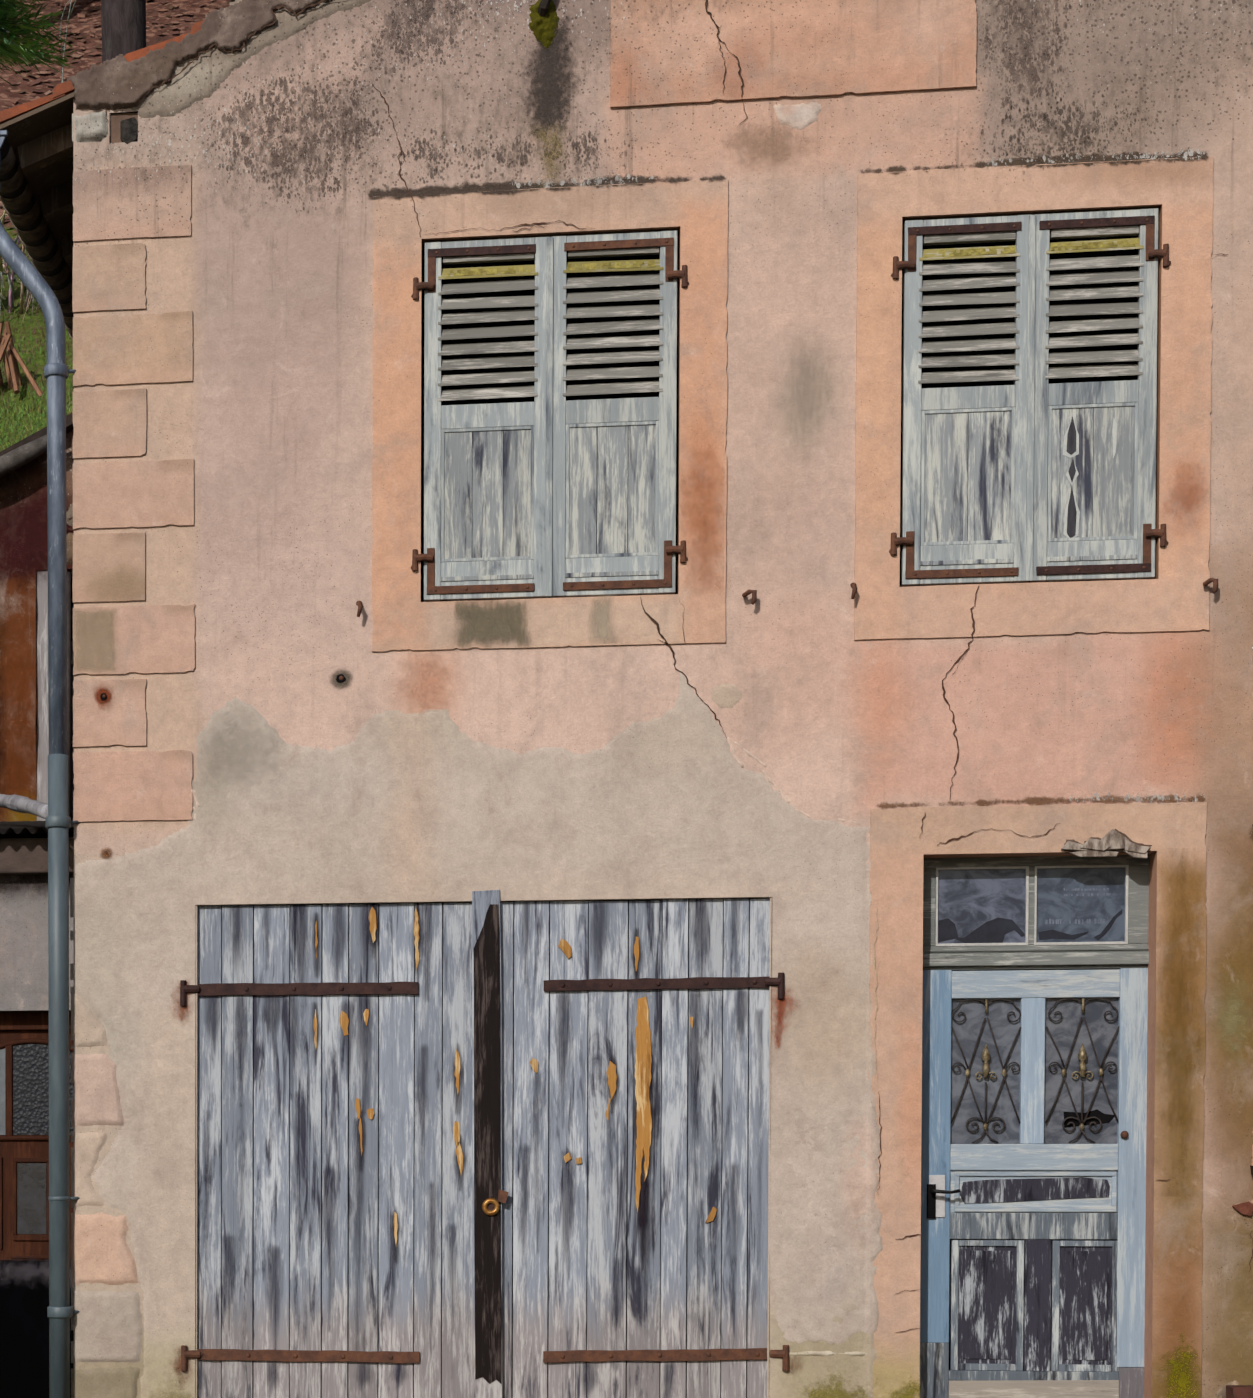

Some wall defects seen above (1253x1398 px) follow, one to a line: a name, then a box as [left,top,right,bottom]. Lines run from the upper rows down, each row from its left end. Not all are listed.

mould [211,68,386,212]
leakage [368,17,726,199]
crack [705,0,748,125]
mould [861,87,1208,174]
crack [640,596,726,735]
crack [920,586,1060,846]
flaking render [70,670,883,1398]